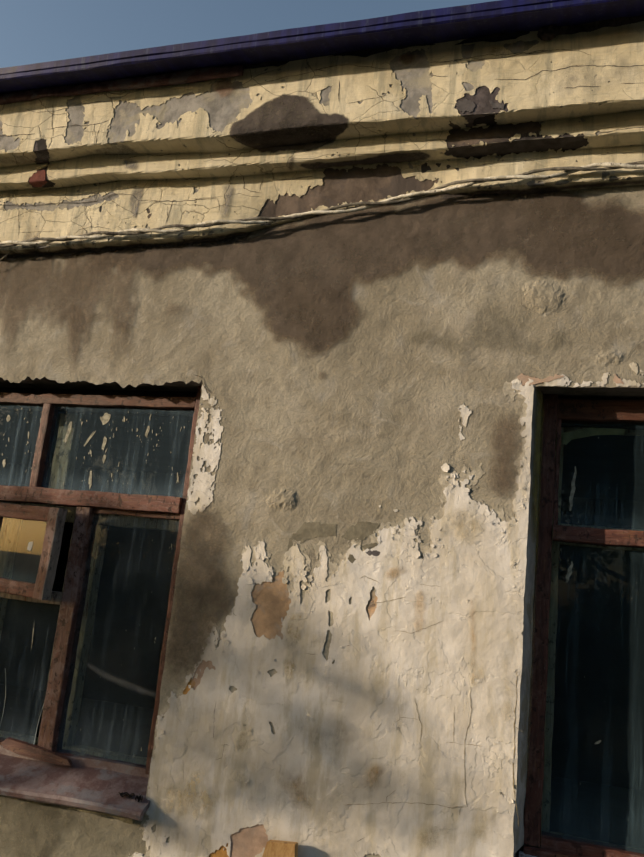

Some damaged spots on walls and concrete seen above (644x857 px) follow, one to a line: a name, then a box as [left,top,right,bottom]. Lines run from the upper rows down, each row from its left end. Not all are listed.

spalling [28,139,56,188]
crack [27,101,170,163]
crack [13,174,312,235]
leakage [0,181,644,352]
peeling [390,48,433,119]
peeling [255,82,589,221]
peeling [461,44,485,72]
crack [431,49,643,88]
leakage [165,514,227,672]
peeling [129,362,644,857]
crack [347,691,478,815]
crack [513,680,521,826]